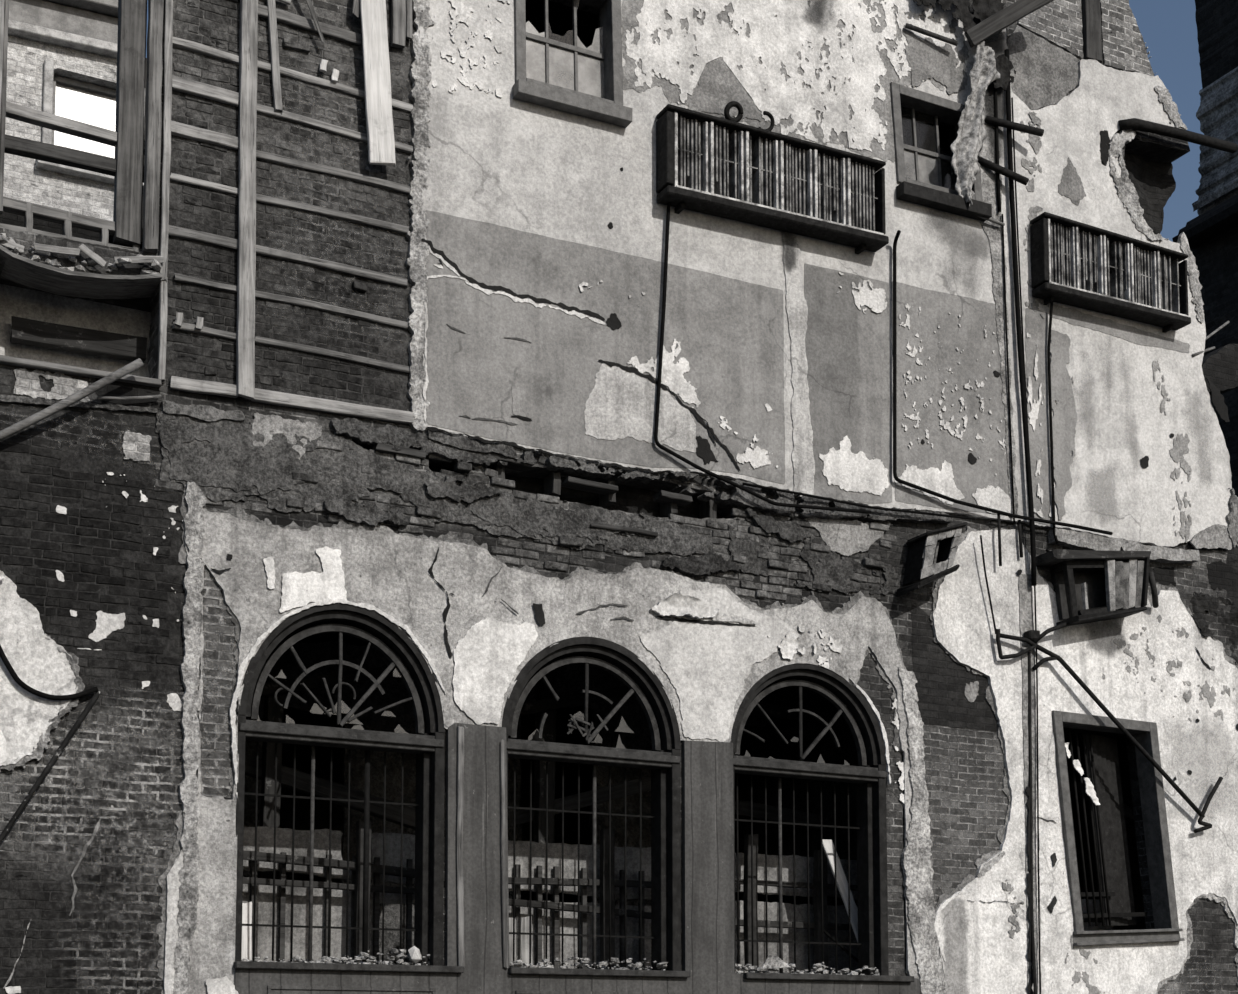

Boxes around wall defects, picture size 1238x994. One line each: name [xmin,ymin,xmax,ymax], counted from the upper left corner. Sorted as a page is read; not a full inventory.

peeling [621,0,969,163]
spalling [1099,129,1204,324]
spalling [330,418,508,504]
crack [421,238,653,472]
crack [598,360,740,471]
spalling [696,435,718,464]
peeling [819,272,1012,513]
crack [429,547,524,658]
spalling [744,507,808,543]
spalling [1118,433,1238,722]
spalling [1065,935,1105,994]
spalling [1156,893,1238,994]